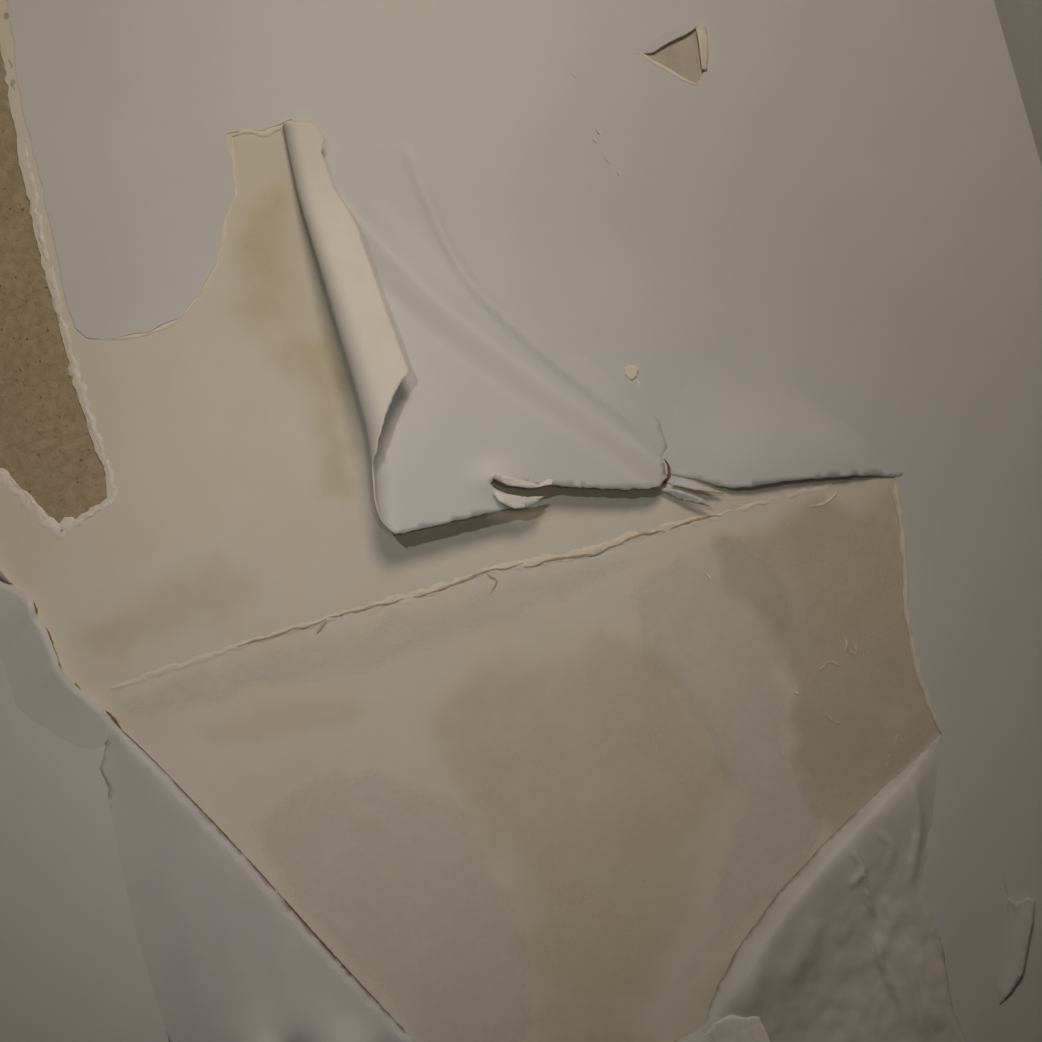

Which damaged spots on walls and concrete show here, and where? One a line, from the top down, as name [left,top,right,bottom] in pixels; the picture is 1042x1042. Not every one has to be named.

peeling [638,22,708,85]
peeling [0,581,119,749]
peeling [253,651,340,678]
peeling [283,119,667,534]
crack [111,481,843,690]
peeling [475,586,534,618]
peeling [652,488,710,506]
peeling [641,542,815,913]
peeling [671,359,903,488]
peeling [100,726,414,1042]
peeling [272,775,524,1042]
peeling [674,735,968,1042]